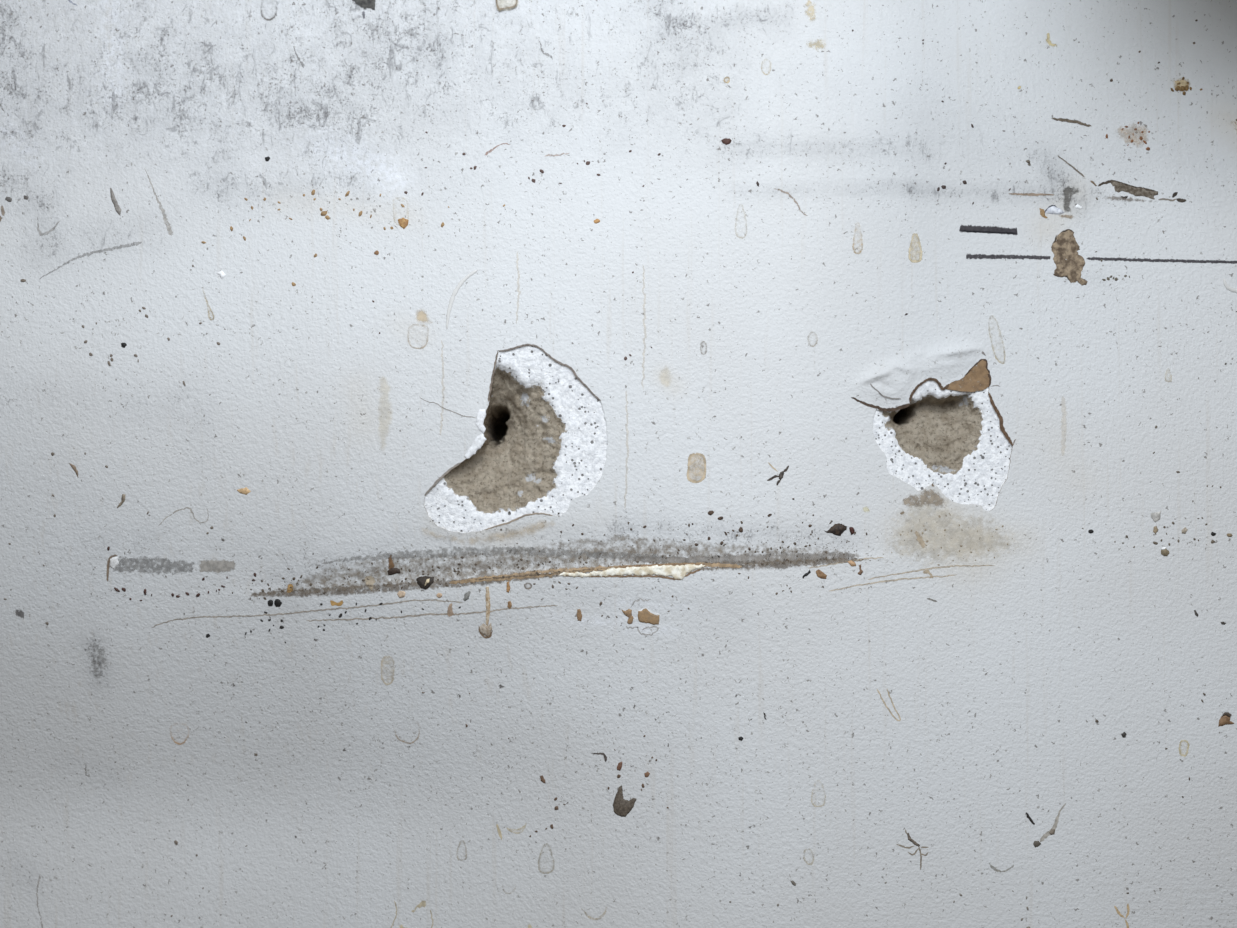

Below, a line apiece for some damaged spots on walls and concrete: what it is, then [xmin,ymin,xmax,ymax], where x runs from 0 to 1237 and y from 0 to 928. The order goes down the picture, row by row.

spalling [421,344,608,533]
spalling [851,351,1016,511]